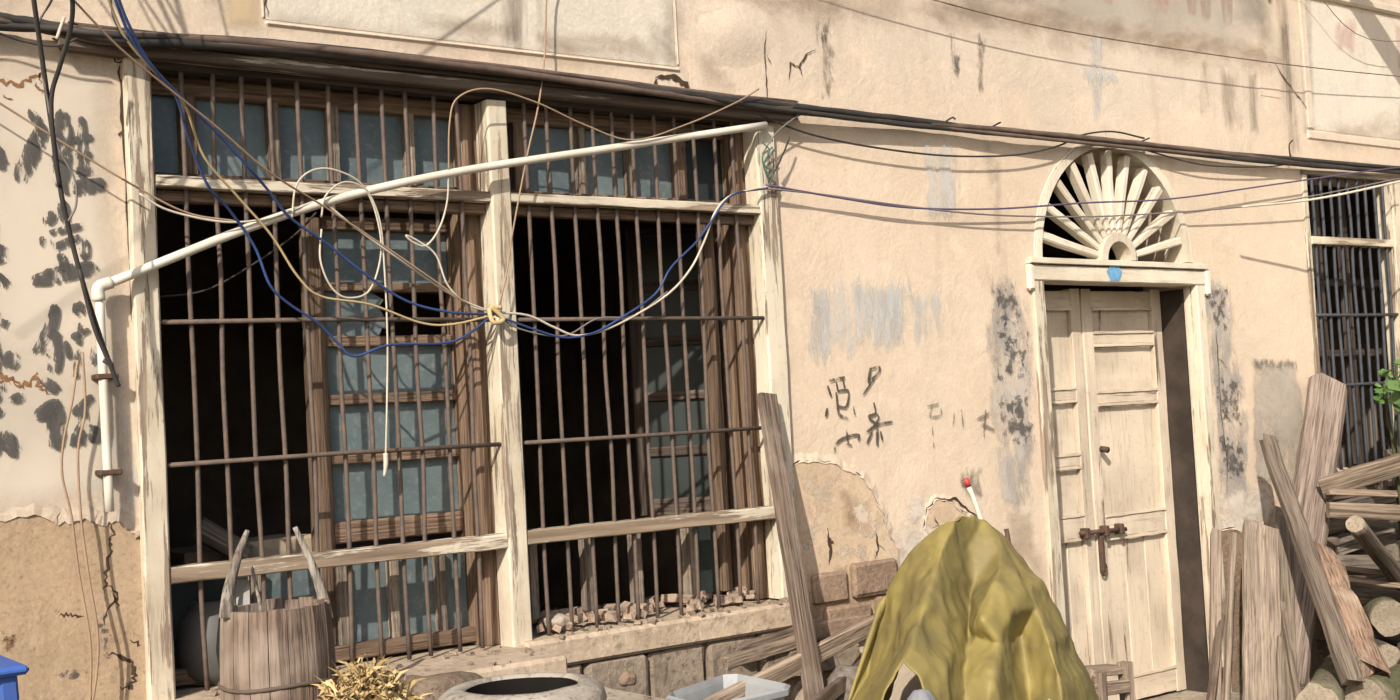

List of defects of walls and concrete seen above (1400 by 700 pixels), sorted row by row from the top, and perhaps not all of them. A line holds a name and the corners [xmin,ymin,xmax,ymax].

mould [988,286,1035,504]
mould [1206,286,1248,497]
peeling [0,501,147,700]
crack [59,523,140,690]
peeling [792,452,974,622]